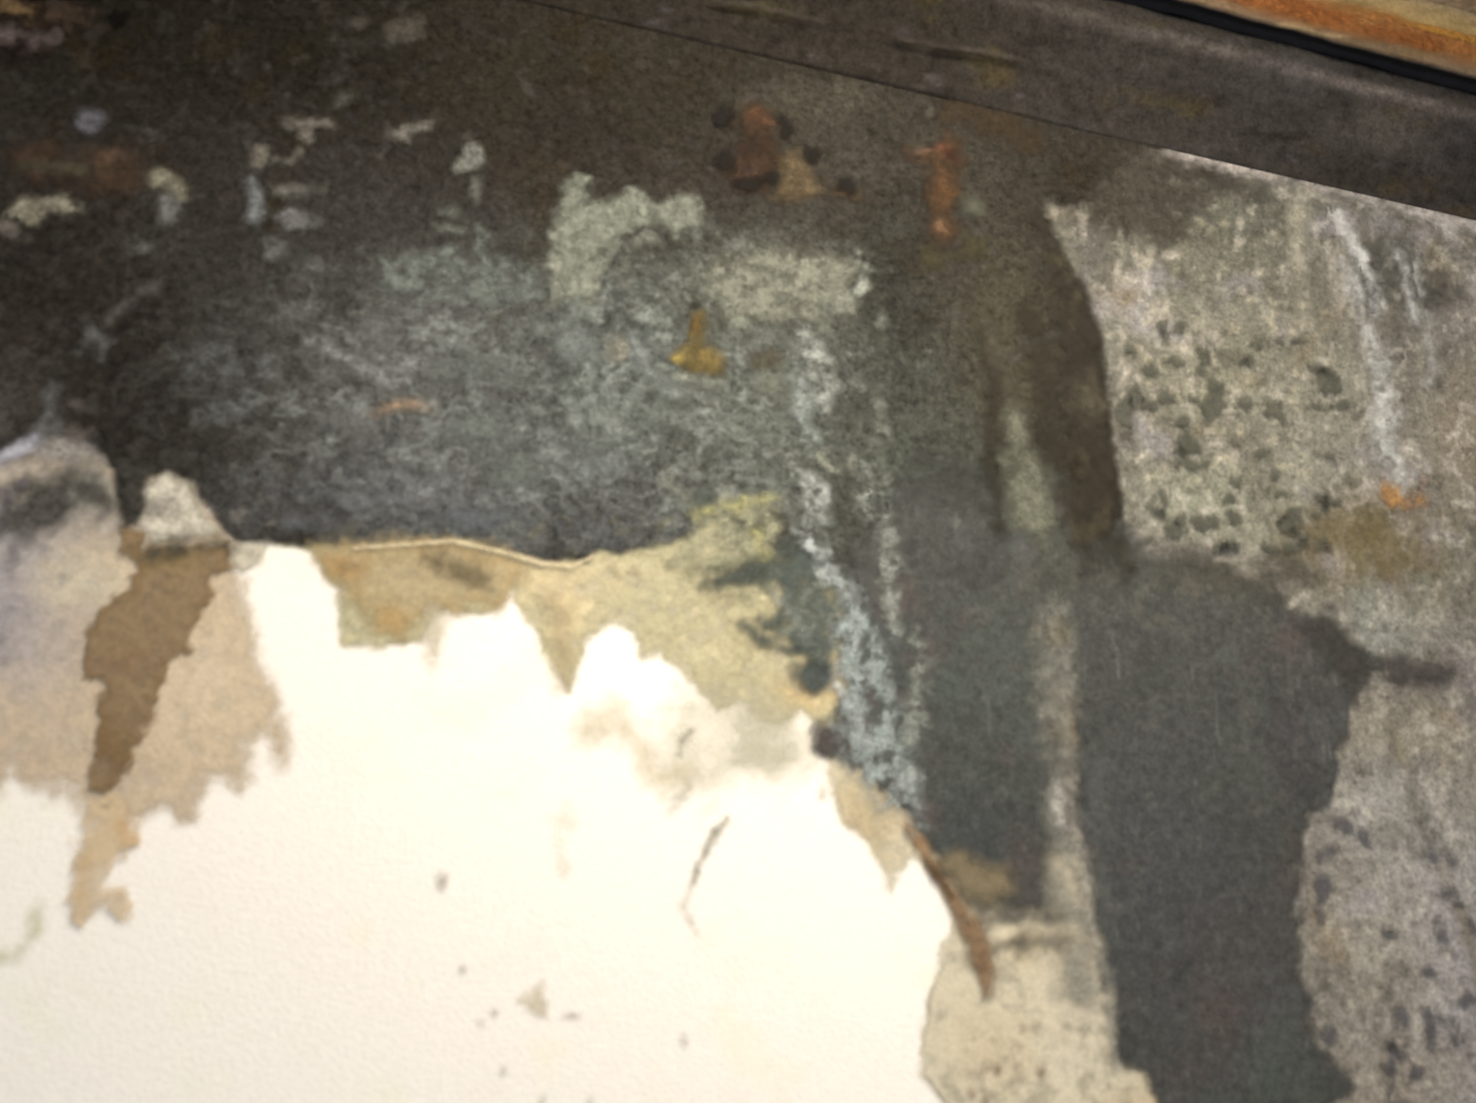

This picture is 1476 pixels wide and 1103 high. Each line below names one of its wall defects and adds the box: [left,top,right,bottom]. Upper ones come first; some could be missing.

peeling [1428,0,1476,14]
corrosion [714,104,821,200]
corrosion [916,133,982,239]
peeling [306,338,498,412]
peeling [557,327,592,355]
water stain [0,0,1286,637]
peeling [0,387,850,822]
water stain [84,529,233,792]
water stain [1388,655,1454,686]
water stain [715,473,1382,1103]
water stain [68,794,140,926]